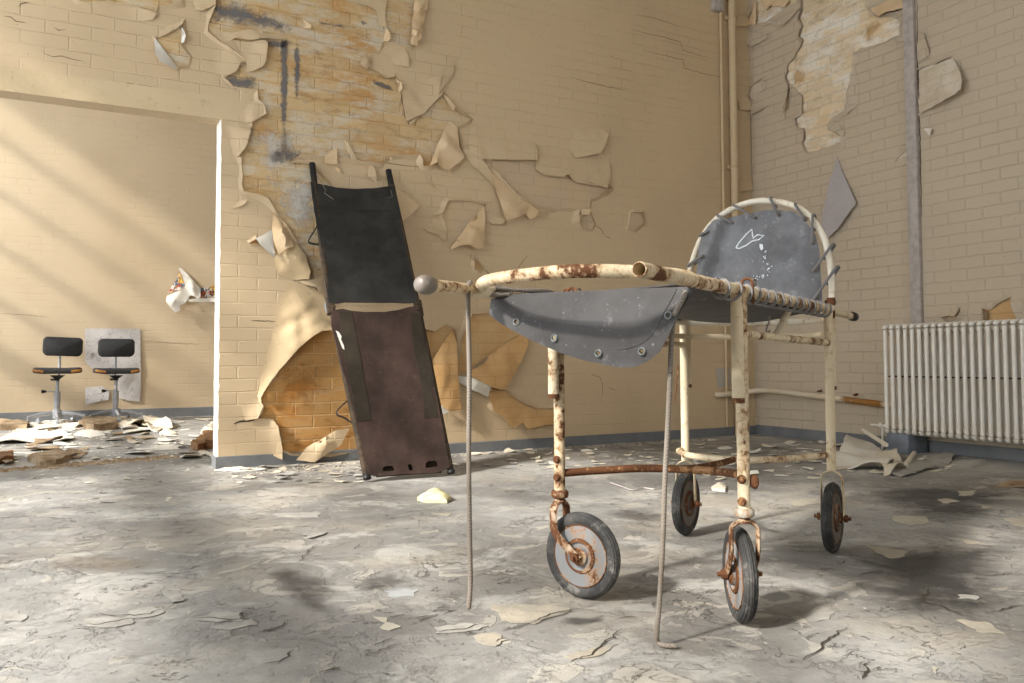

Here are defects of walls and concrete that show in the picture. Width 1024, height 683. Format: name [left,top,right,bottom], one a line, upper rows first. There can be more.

leakage [214,6,300,122]
leakage [263,133,299,167]
peeling [736,0,903,237]
peeling [916,32,964,136]
leakage [281,185,312,225]
peeling [71,0,614,483]
crack [787,627,847,660]